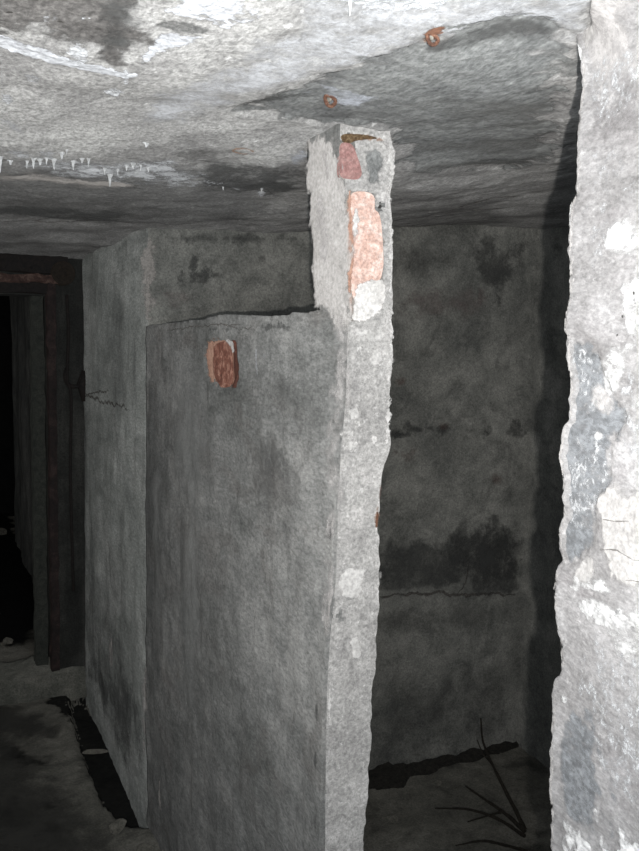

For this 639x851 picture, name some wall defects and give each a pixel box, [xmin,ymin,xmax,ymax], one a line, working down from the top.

damp [0,0,259,97]
corrosion [424,27,445,42]
damp [0,151,297,196]
damp [366,149,383,183]
spalling [232,14,586,386]
spalling [206,339,239,388]
peeling [332,352,360,452]
spalling [371,398,391,444]
spalling [559,312,639,588]
spalling [550,710,601,851]